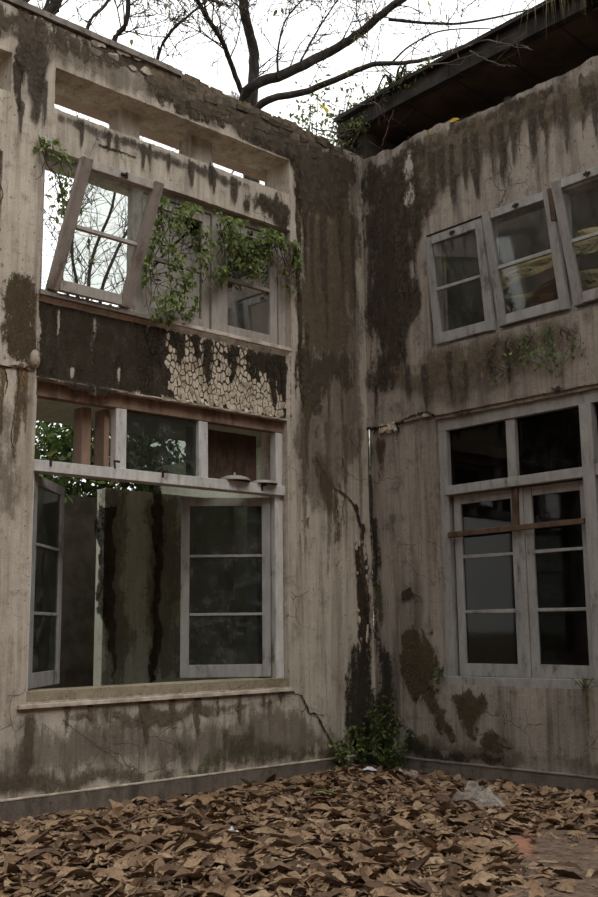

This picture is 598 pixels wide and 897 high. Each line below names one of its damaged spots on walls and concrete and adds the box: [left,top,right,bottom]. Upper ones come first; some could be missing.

leakage [0,4,123,133]
leakage [58,62,598,468]
leakage [0,272,150,457]
peeling [135,323,292,419]
crack [292,691,333,745]
leakage [399,625,545,770]